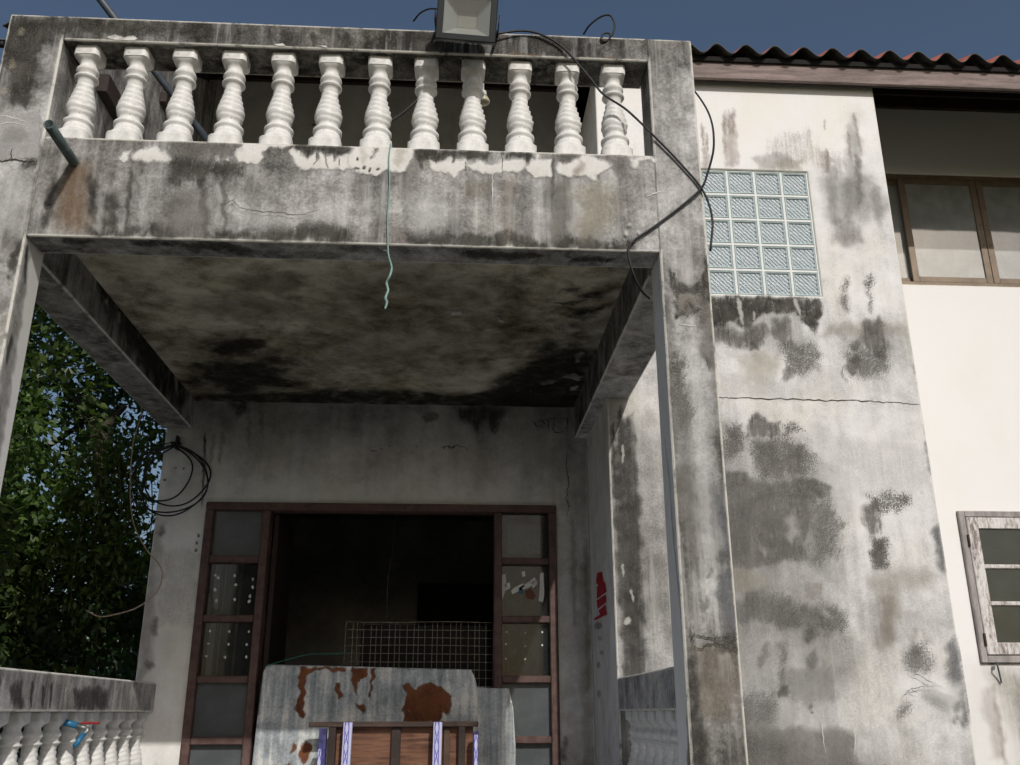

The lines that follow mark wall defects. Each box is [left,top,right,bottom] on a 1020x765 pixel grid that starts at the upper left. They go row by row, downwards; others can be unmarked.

peeling [119,145,174,163]
leakage [60,142,351,255]
peeling [214,144,414,176]
leakage [97,281,607,433]
leakage [664,260,823,381]
crack [720,368,915,405]
leakage [844,273,891,379]
leakage [611,408,646,676]
leakage [709,413,849,654]
leakage [865,489,912,569]
leakage [933,525,945,569]
leakage [947,639,970,722]